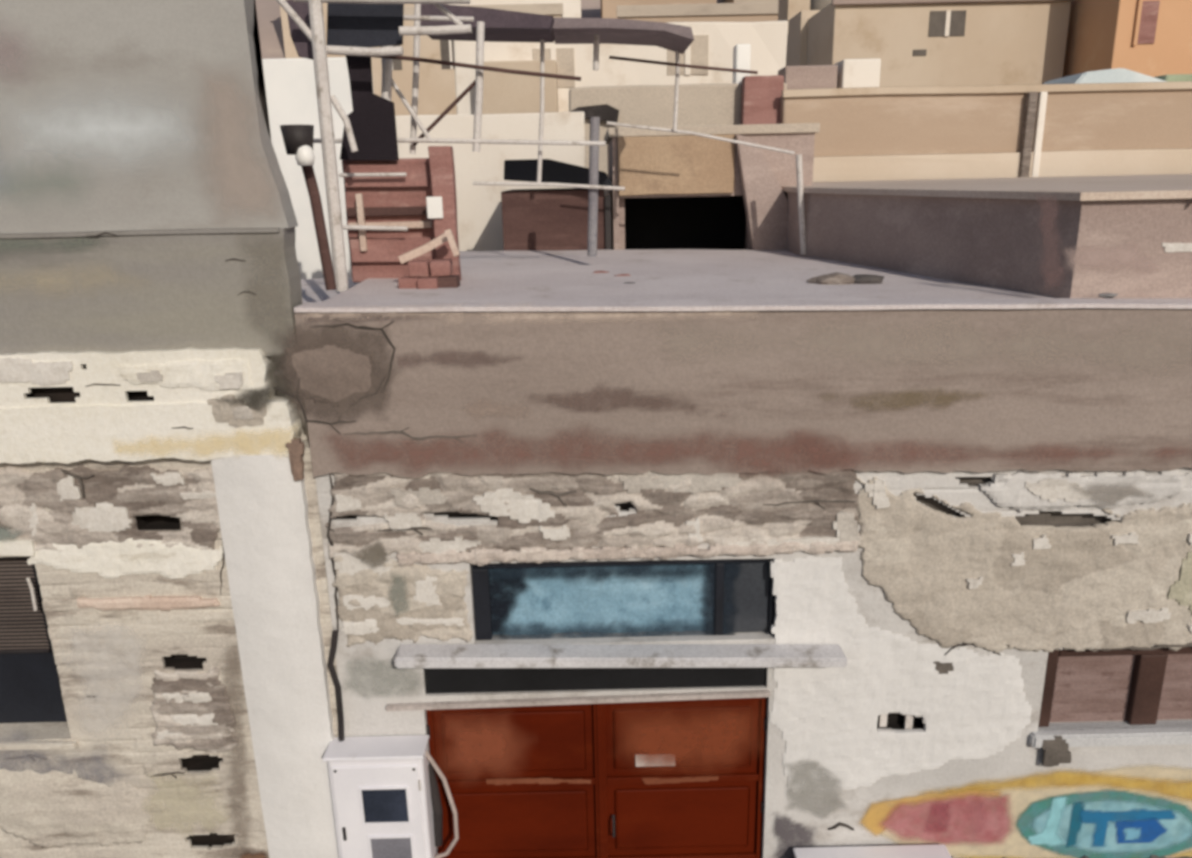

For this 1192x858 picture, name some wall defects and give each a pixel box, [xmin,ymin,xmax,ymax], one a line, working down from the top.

crack [273,321,477,443]
flaking render [0,464,224,579]
flaking render [326,469,1192,792]
flaking render [150,654,239,771]
spalling [186,833,235,847]